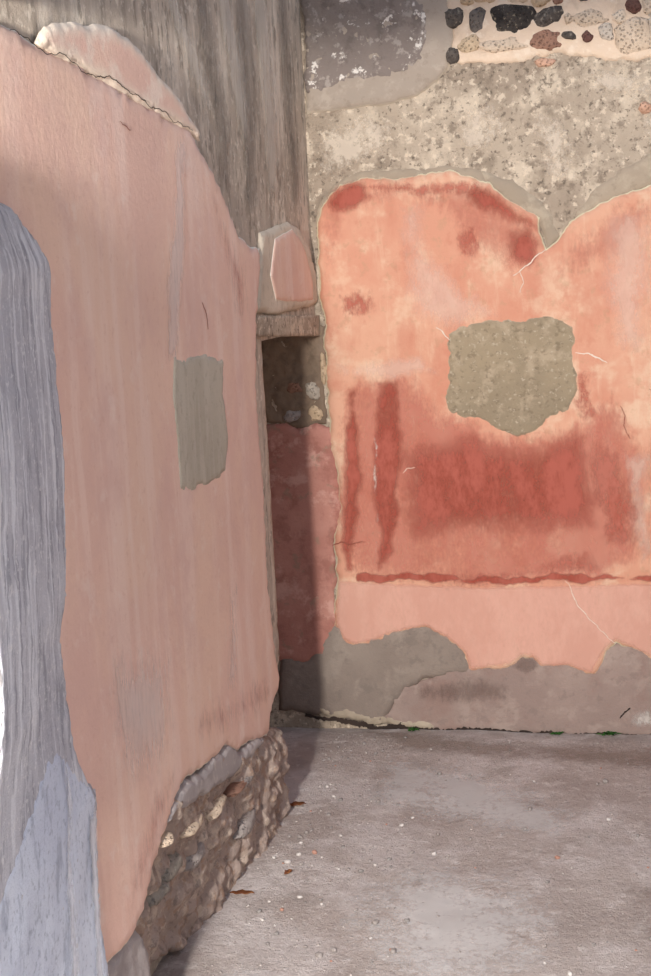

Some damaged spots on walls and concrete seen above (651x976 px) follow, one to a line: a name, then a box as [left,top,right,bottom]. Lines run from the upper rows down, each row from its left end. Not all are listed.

flaking render [445,0,651,67]
peeling [278,626,651,734]
flaking render [107,727,291,976]